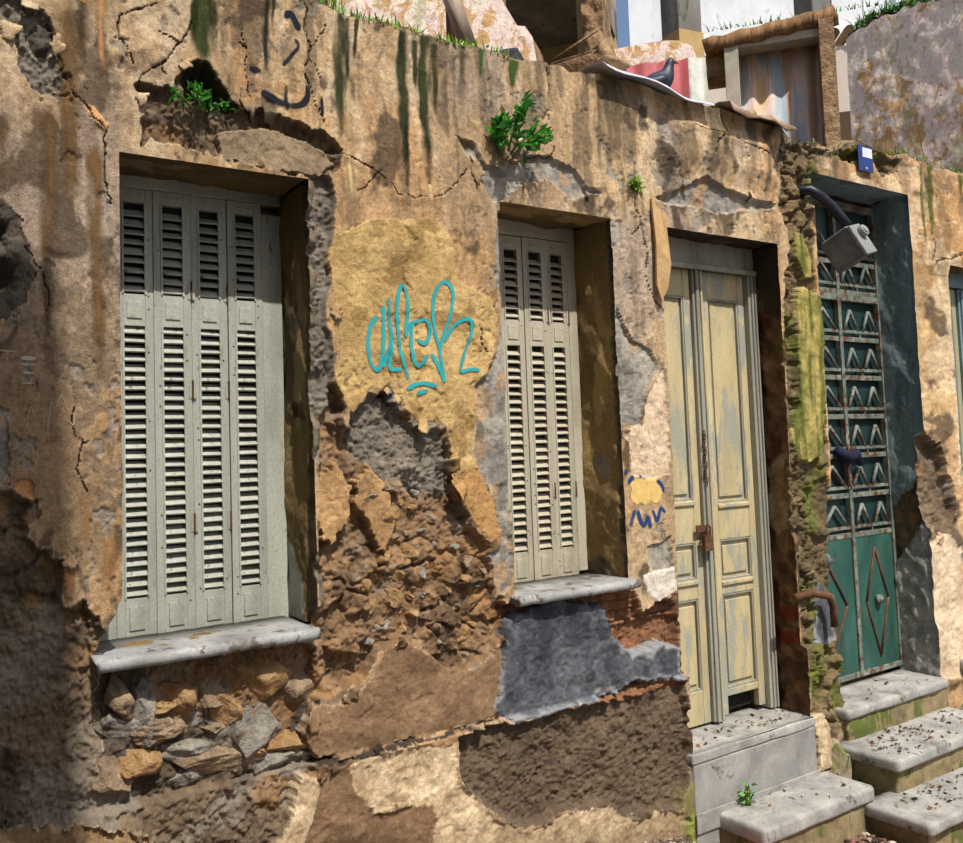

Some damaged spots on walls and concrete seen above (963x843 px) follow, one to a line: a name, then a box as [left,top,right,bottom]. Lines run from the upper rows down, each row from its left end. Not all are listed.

spalling [0,0,66,101]
crack [117,1,191,83]
water stain [264,0,275,64]
water stain [334,13,359,128]
water stain [396,31,438,167]
water stain [509,59,518,85]
crack [71,406,89,492]
spalling [0,57,602,843]
spalling [647,142,903,773]
peeling [913,430,963,678]
spalling [458,589,693,828]